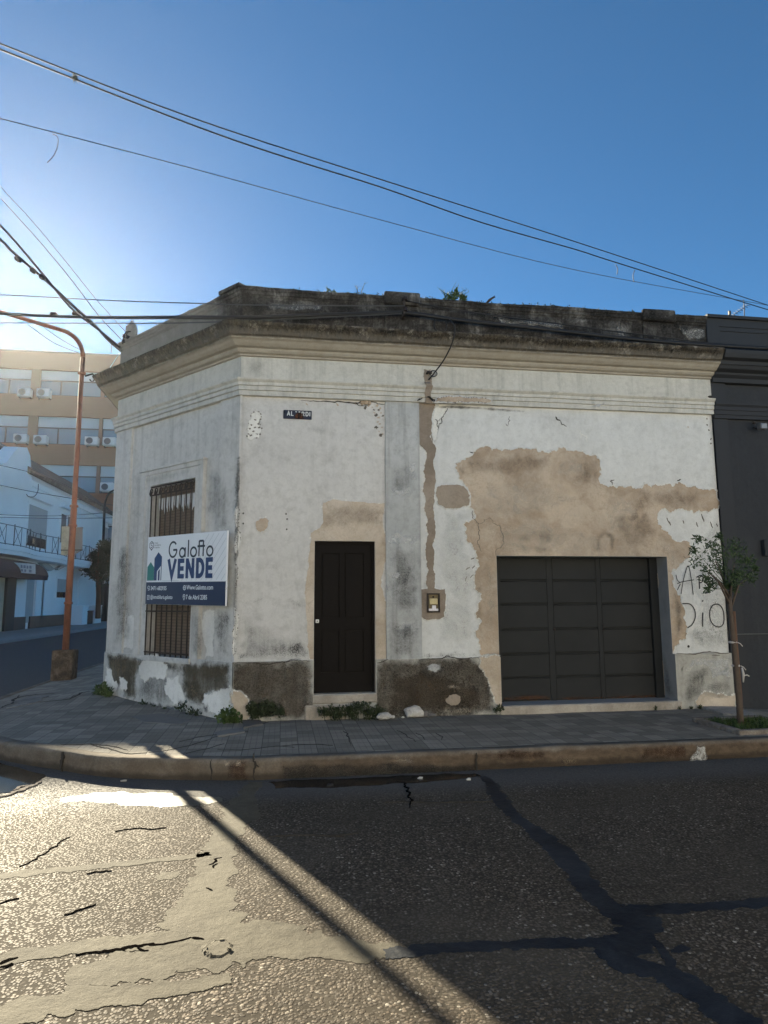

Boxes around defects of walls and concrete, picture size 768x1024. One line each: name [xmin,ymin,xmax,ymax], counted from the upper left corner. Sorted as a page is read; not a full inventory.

peeling [246,409,263,441]
peeling [417,395,720,710]
leakage [109,644,312,718]
leakage [377,654,493,717]
crack [19,837,70,867]
crack [115,825,166,833]